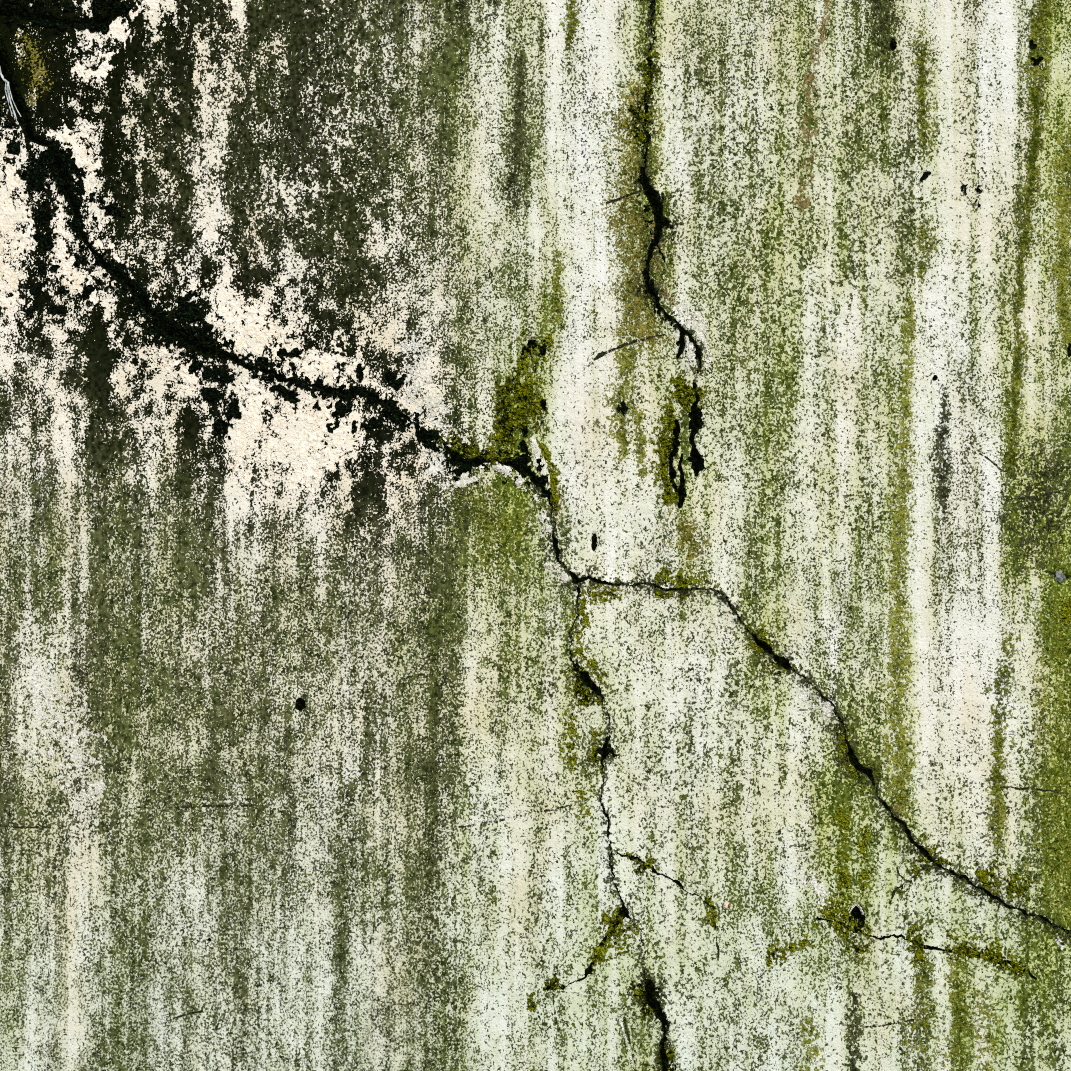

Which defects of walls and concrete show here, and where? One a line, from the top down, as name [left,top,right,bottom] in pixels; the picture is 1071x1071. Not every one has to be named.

crack [0,31,54,147]
crack [0,0,132,35]
crack [20,139,1071,948]
damp [590,72,675,481]
crack [606,0,708,374]
damp [846,0,938,148]
damp [875,297,959,819]
damp [981,0,1071,925]
damp [394,471,540,1071]
crack [542,710,701,1071]
crack [766,899,1037,982]
damp [902,952,1005,1071]